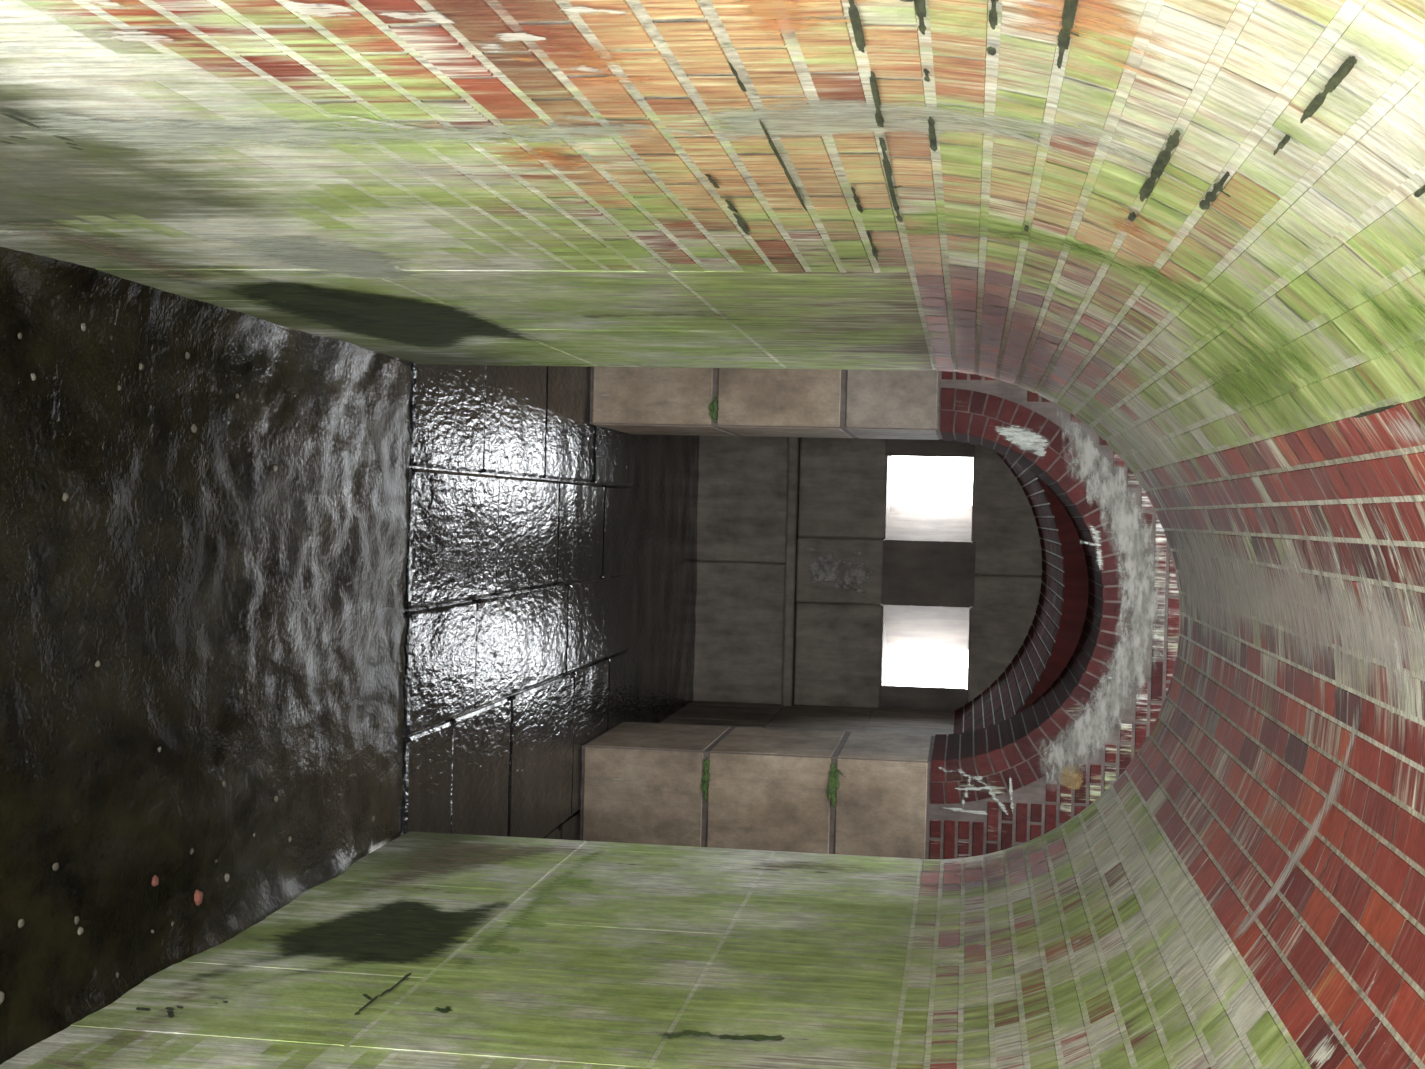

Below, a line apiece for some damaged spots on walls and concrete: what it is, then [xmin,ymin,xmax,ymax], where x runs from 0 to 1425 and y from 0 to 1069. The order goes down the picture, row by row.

crack [900,0,930,82]
crack [987,0,998,55]
crack [1057,0,1079,69]
crack [848,0,903,261]
crack [1128,130,1180,221]
crack [1273,56,1357,155]
leakage [217,238,528,348]
leakage [998,427,1047,456]
leakage [1388,414,1425,452]
leakage [1045,423,1425,782]
leakage [1233,716,1358,939]
leakage [267,844,592,972]